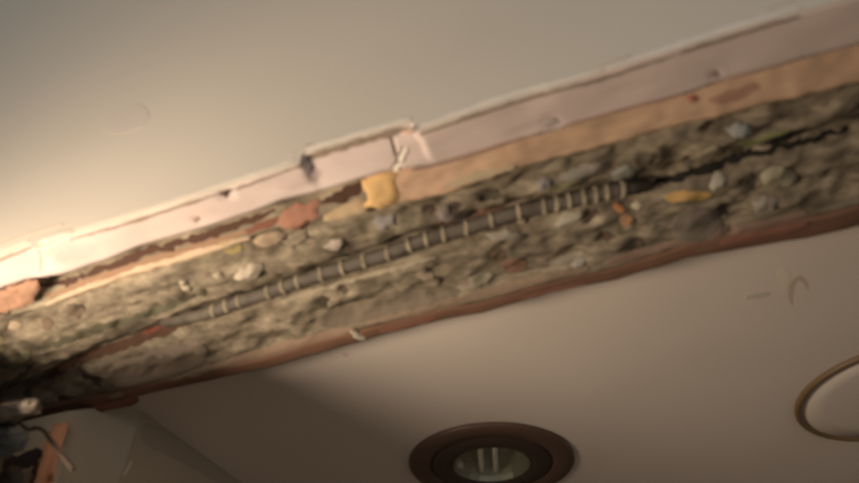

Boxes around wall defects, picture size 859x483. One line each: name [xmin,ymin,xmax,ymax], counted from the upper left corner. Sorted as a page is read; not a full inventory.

crack [235,16,802,190]
peeling [306,6,800,150]
crack [0,208,275,288]
crack [70,194,215,240]
peeling [74,159,294,231]
crack [320,181,363,204]
spalling [160,164,654,328]
crack [634,126,848,195]
spalling [66,303,85,319]
peeling [0,398,42,423]
spalling [2,447,43,471]